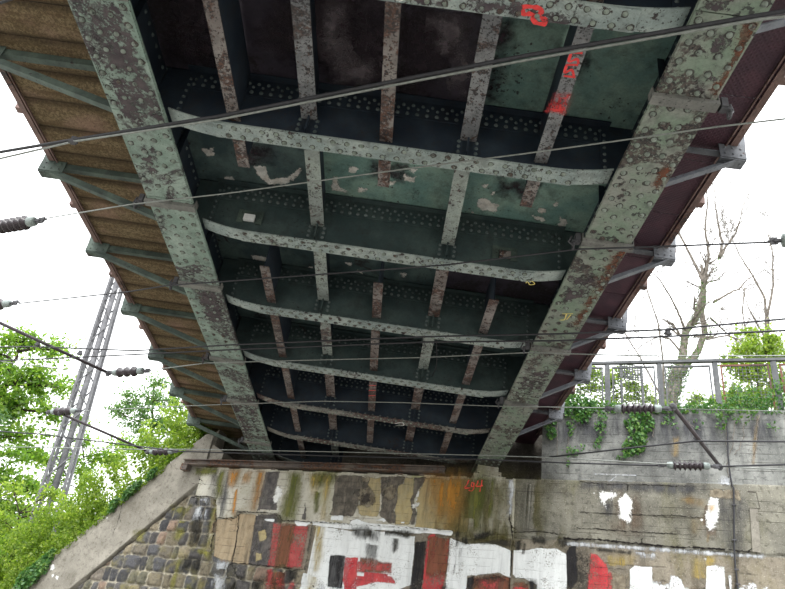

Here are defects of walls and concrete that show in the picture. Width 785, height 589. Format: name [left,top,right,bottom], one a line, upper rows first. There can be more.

peeling [254,165,302,185]
peeling [471,184,499,213]
water stain [192,473,228,519]
crack [192,479,453,587]
efflorescence [214,561,228,589]